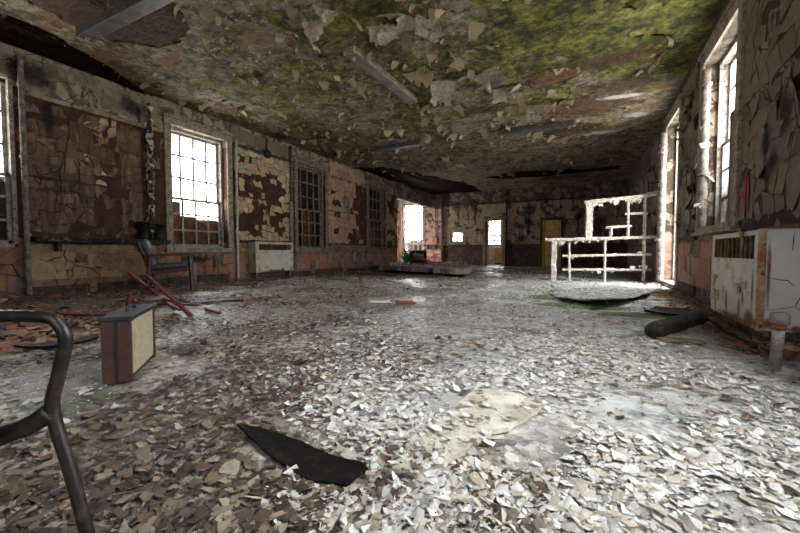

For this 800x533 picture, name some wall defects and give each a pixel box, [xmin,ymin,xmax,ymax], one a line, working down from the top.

peeling [622,22,680,79]
peeling [0,0,631,269]
leakage [465,103,510,115]
crack [753,1,800,213]
crack [46,248,101,277]
peeling [31,244,147,281]